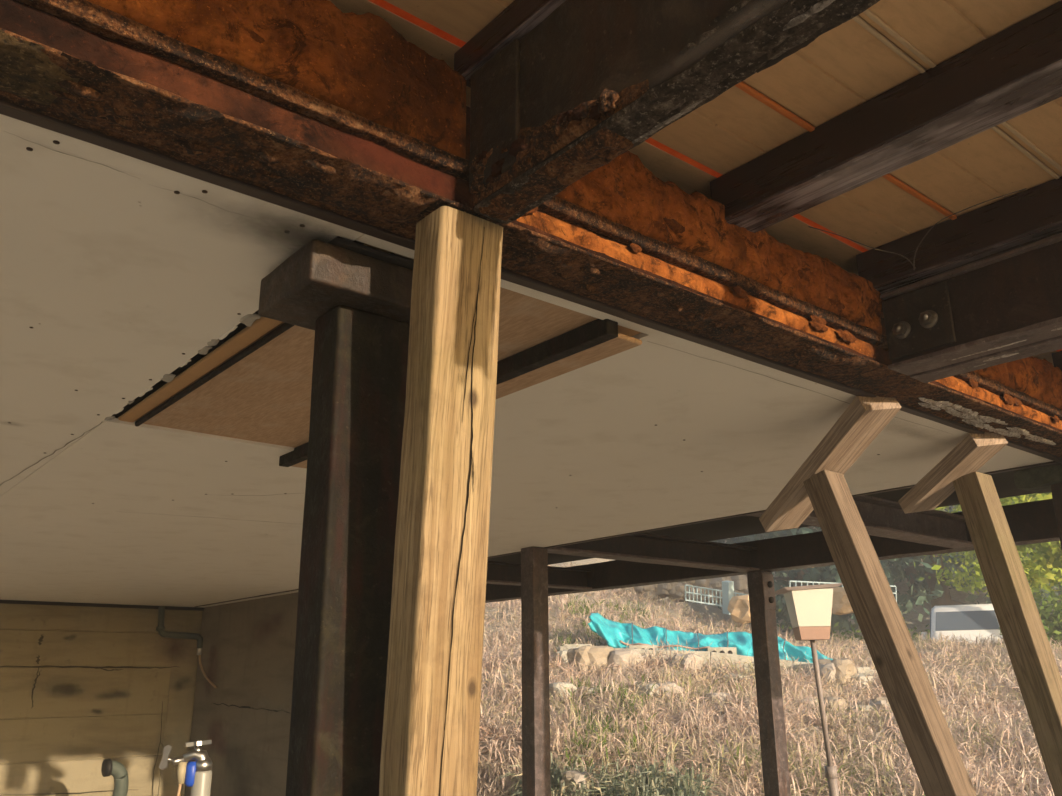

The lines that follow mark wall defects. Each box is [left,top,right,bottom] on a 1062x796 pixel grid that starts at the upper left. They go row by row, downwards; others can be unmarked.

corrosion [86,0,467,159]